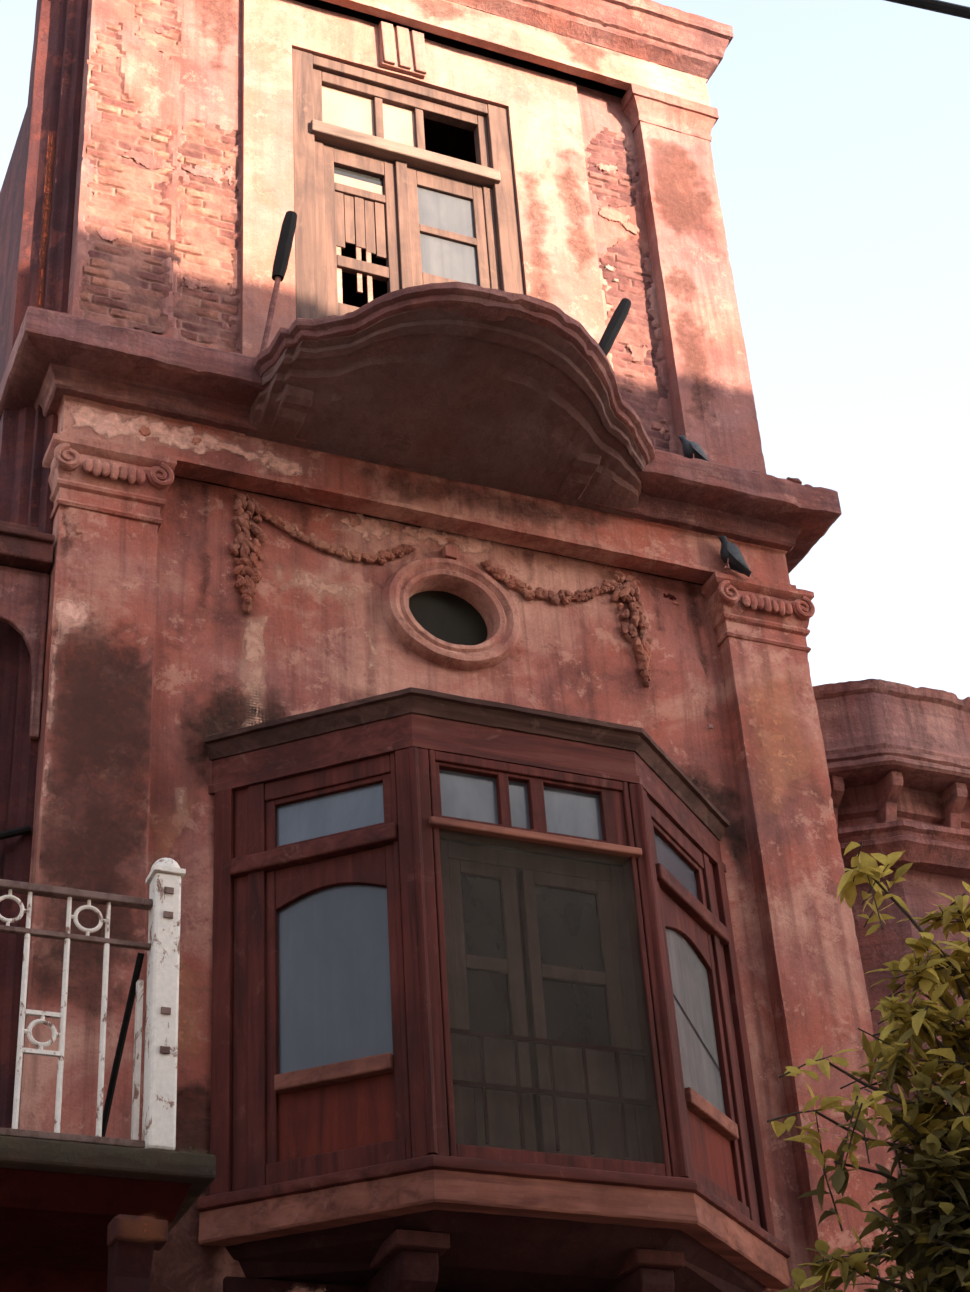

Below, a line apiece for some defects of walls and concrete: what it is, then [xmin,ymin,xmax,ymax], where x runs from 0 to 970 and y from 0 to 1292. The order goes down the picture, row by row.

flaking render [79,0,241,353]
peeling [71,406,302,475]
flaking render [584,131,670,452]
water stain [31,624,152,1014]
water stain [187,623,285,774]